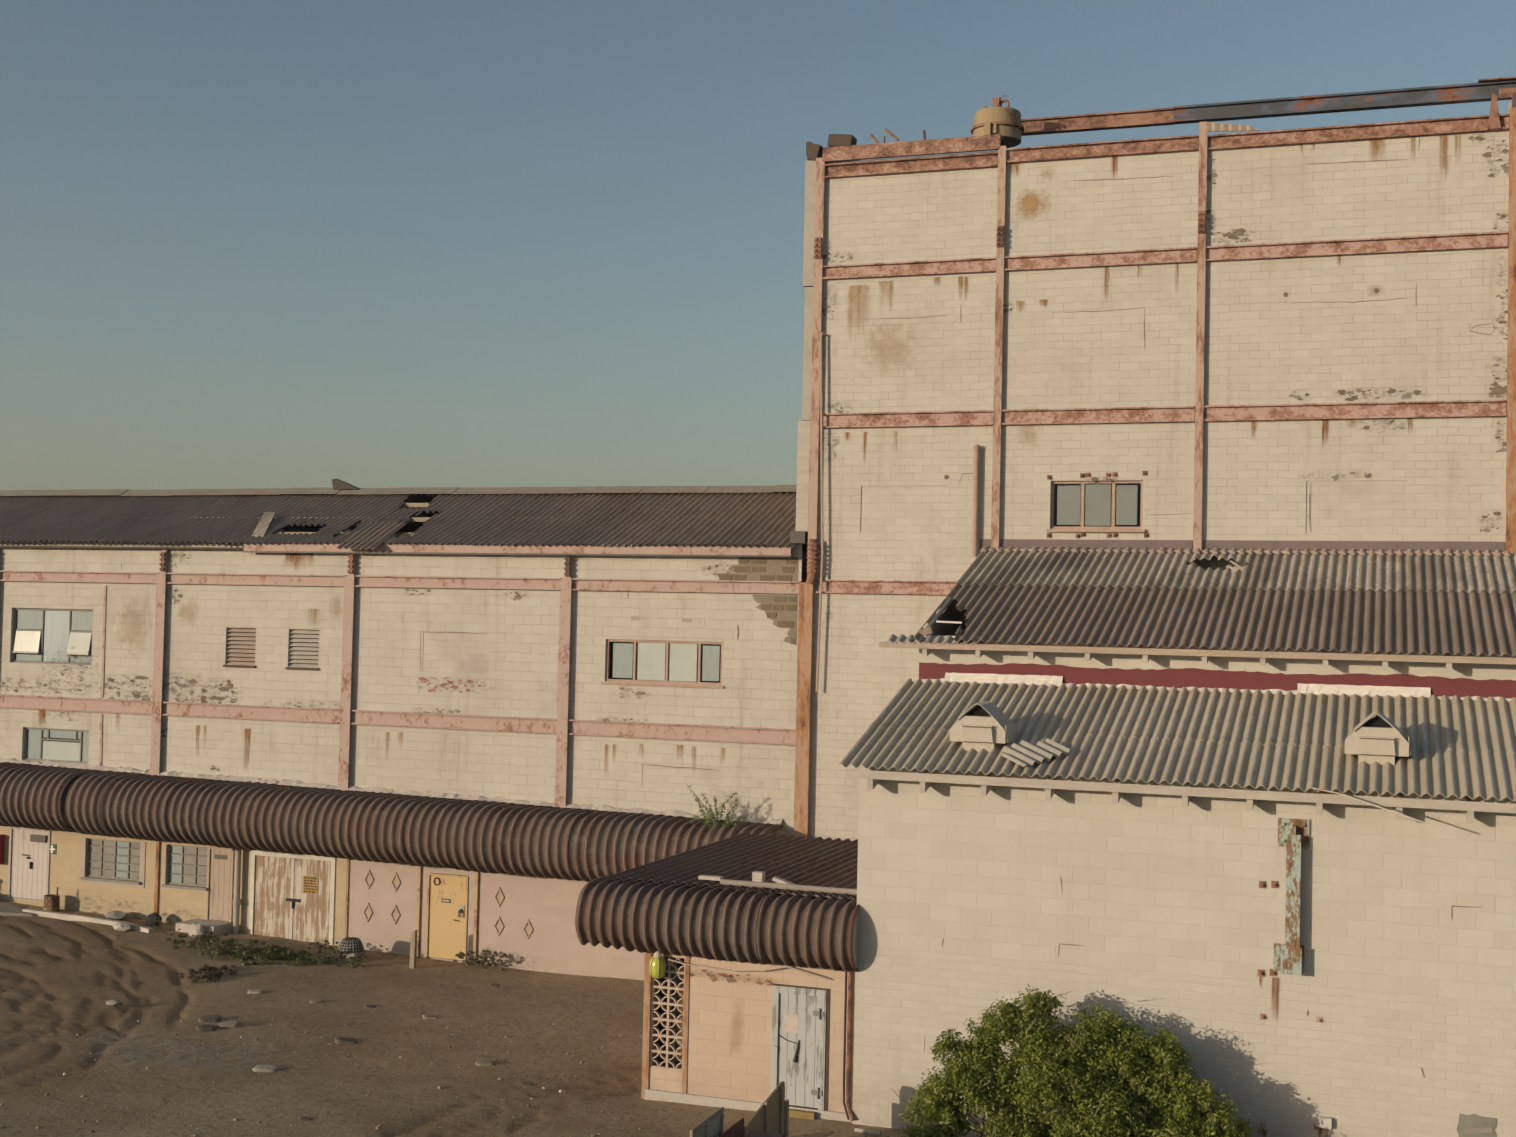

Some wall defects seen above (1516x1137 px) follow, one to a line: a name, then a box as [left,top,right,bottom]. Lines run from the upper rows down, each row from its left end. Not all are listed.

peeling [1468,134,1509,177]
peeling [1206,210,1252,243]
peeling [1338,388,1421,401]
peeling [2,653,238,721]
peeling [417,677,485,714]